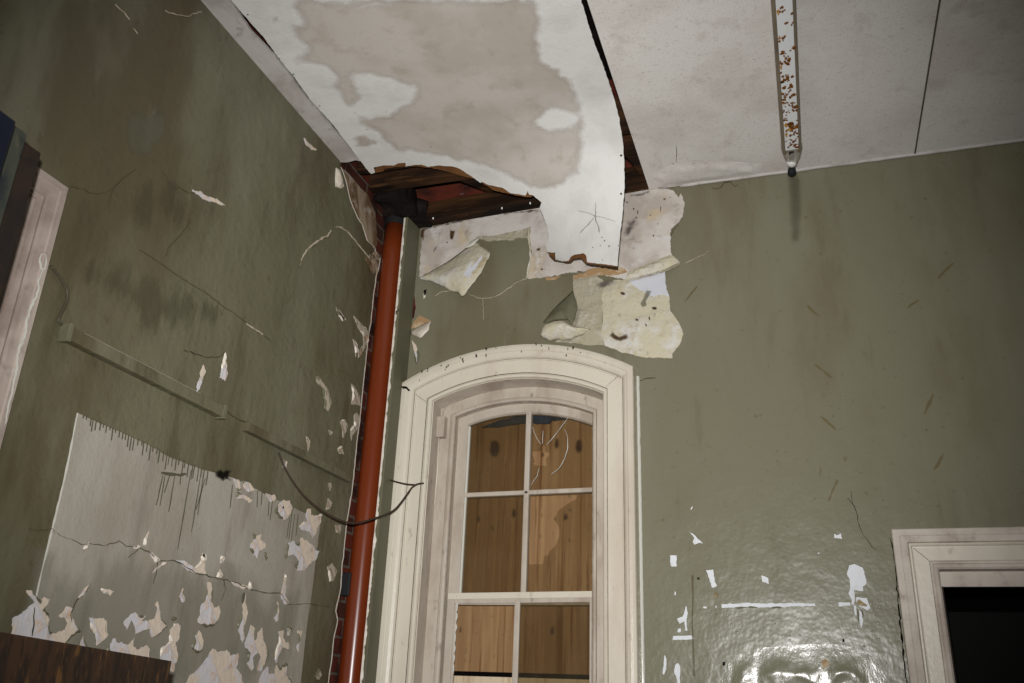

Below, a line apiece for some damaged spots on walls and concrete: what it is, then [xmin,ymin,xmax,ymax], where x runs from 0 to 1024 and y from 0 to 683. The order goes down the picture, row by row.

leakage [296,0,582,187]
rust [777,6,800,148]
crack [140,218,270,340]
peeling [419,188,685,359]
peeling [5,168,380,683]
crack [30,528,327,607]
spalling [673,607,694,640]
spalling [706,570,717,588]
spalling [838,564,870,627]